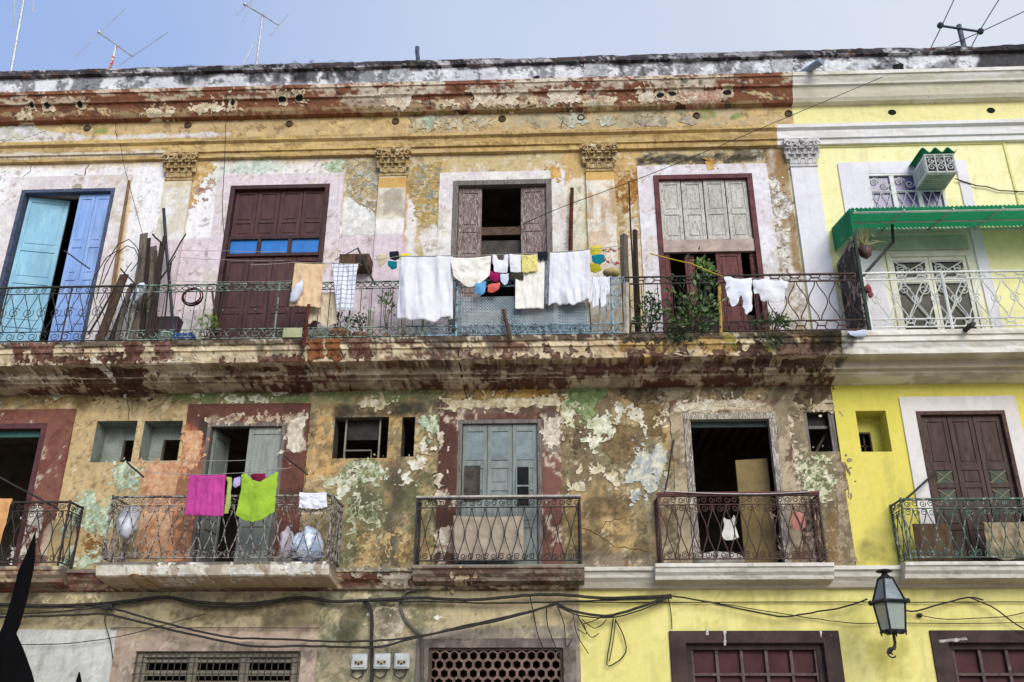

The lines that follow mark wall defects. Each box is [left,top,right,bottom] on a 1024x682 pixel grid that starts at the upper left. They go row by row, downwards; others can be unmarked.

peeling [0,92,57,142]
hole [74,91,93,117]
peeling [139,87,245,122]
hole [271,84,310,112]
peeling [375,63,735,133]
peeling [189,159,275,214]
peeling [407,158,443,221]
peeling [769,176,795,279]
peeling [55,346,318,588]
spalling [279,332,859,650]